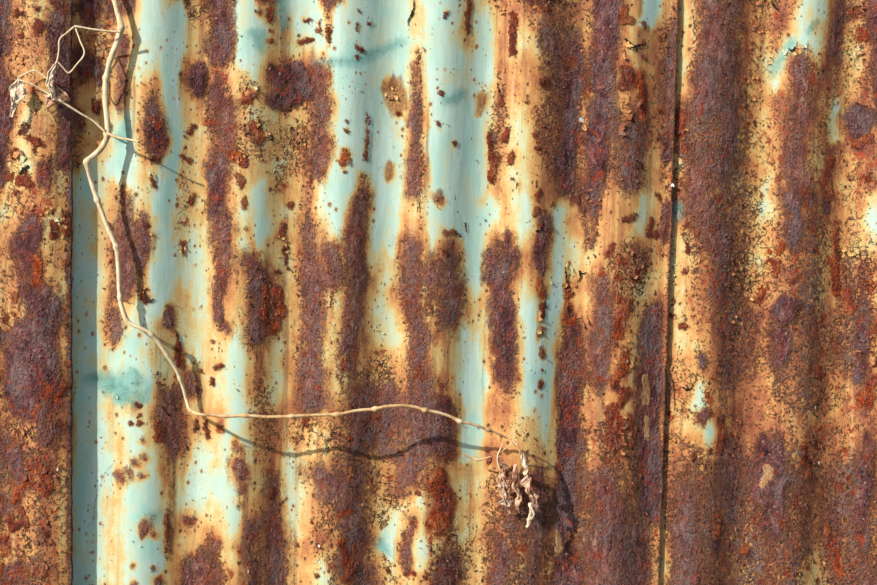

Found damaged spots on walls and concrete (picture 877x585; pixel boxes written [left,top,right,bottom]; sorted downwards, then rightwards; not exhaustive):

rust [140,93,168,189]
rust [464,0,474,36]
peeling [615,95,641,137]
peeling [737,0,767,126]
rust [178,0,467,585]
peeling [614,250,644,292]
peeling [718,225,780,301]
rust [766,48,877,411]
rust [0,210,71,585]
rust [113,454,145,482]
rust [128,304,225,561]
rust [750,431,812,542]